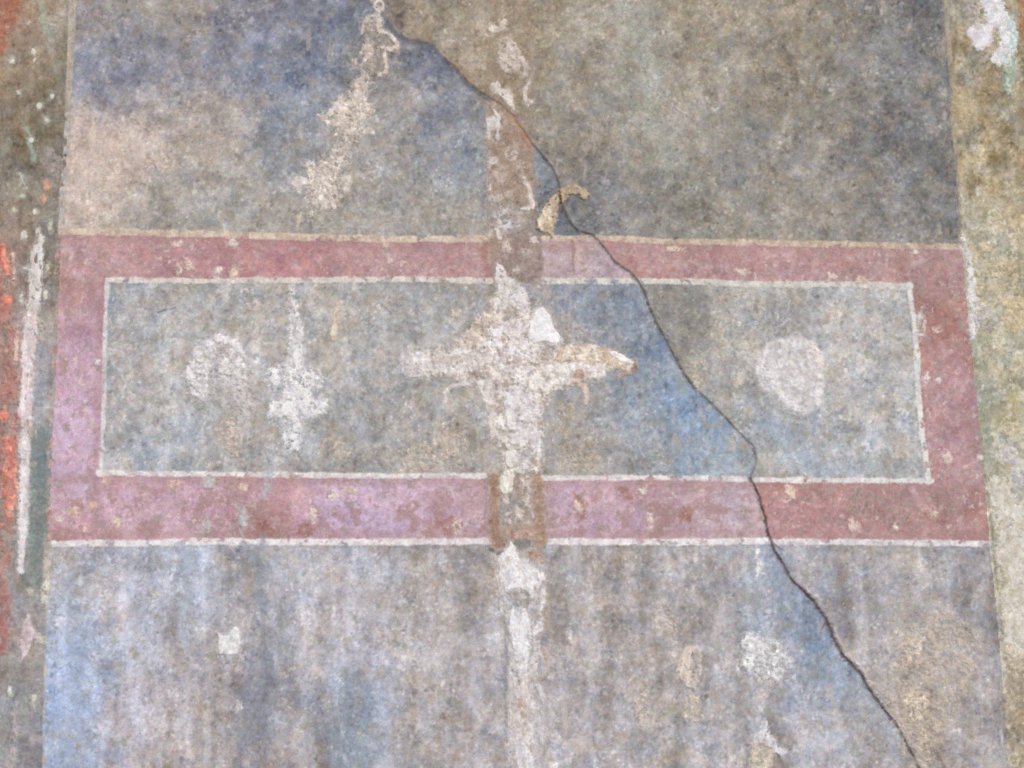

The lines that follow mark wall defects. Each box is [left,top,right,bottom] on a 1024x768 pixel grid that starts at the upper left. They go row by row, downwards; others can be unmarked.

crack [363,0,489,100]
peeling [961,0,1024,103]
peeling [392,13,643,498]
crack [537,147,947,768]
flaking render [213,611,259,669]